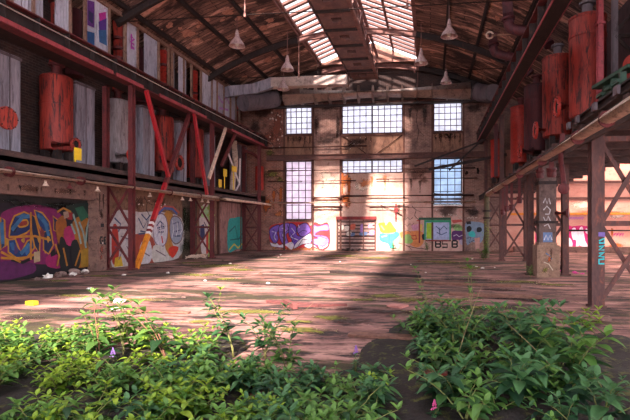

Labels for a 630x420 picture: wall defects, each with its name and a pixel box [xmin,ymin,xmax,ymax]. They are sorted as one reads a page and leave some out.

rust [342,173,351,208]